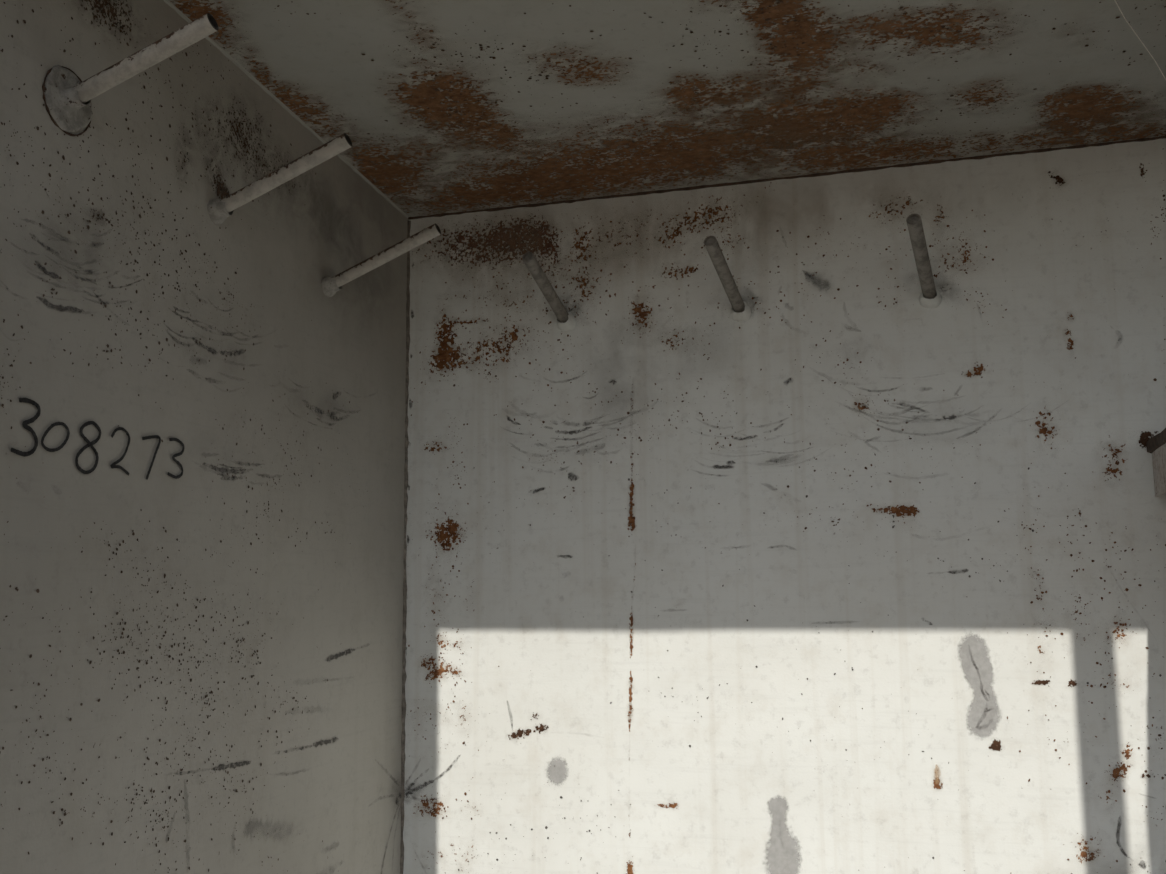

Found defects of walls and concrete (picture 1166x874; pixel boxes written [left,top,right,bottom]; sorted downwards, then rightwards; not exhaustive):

rust [1,0,1166,537]
rust [410,493,474,749]
damp [959,636,999,737]
crack [408,758,458,794]
damp [766,797,800,874]